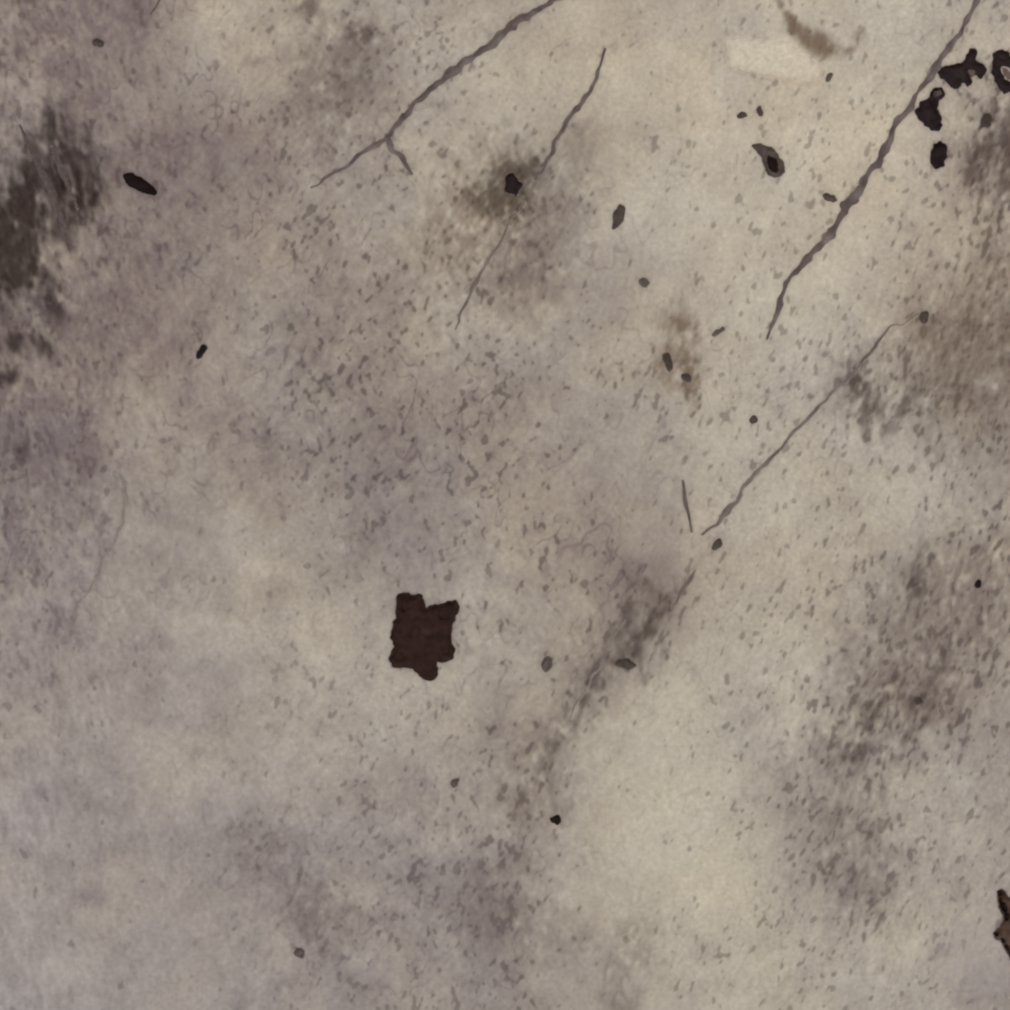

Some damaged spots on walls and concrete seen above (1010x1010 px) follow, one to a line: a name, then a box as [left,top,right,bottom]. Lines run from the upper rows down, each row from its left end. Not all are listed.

crack [310,0,557,188]
crack [534,48,606,180]
peeling [752,143,785,178]
crack [766,0,980,340]
spalling [915,48,1010,169]
crack [455,202,526,330]
crack [682,313,919,535]
spalling [388,592,460,681]
crack [671,570,696,608]
spalling [993,889,1010,957]